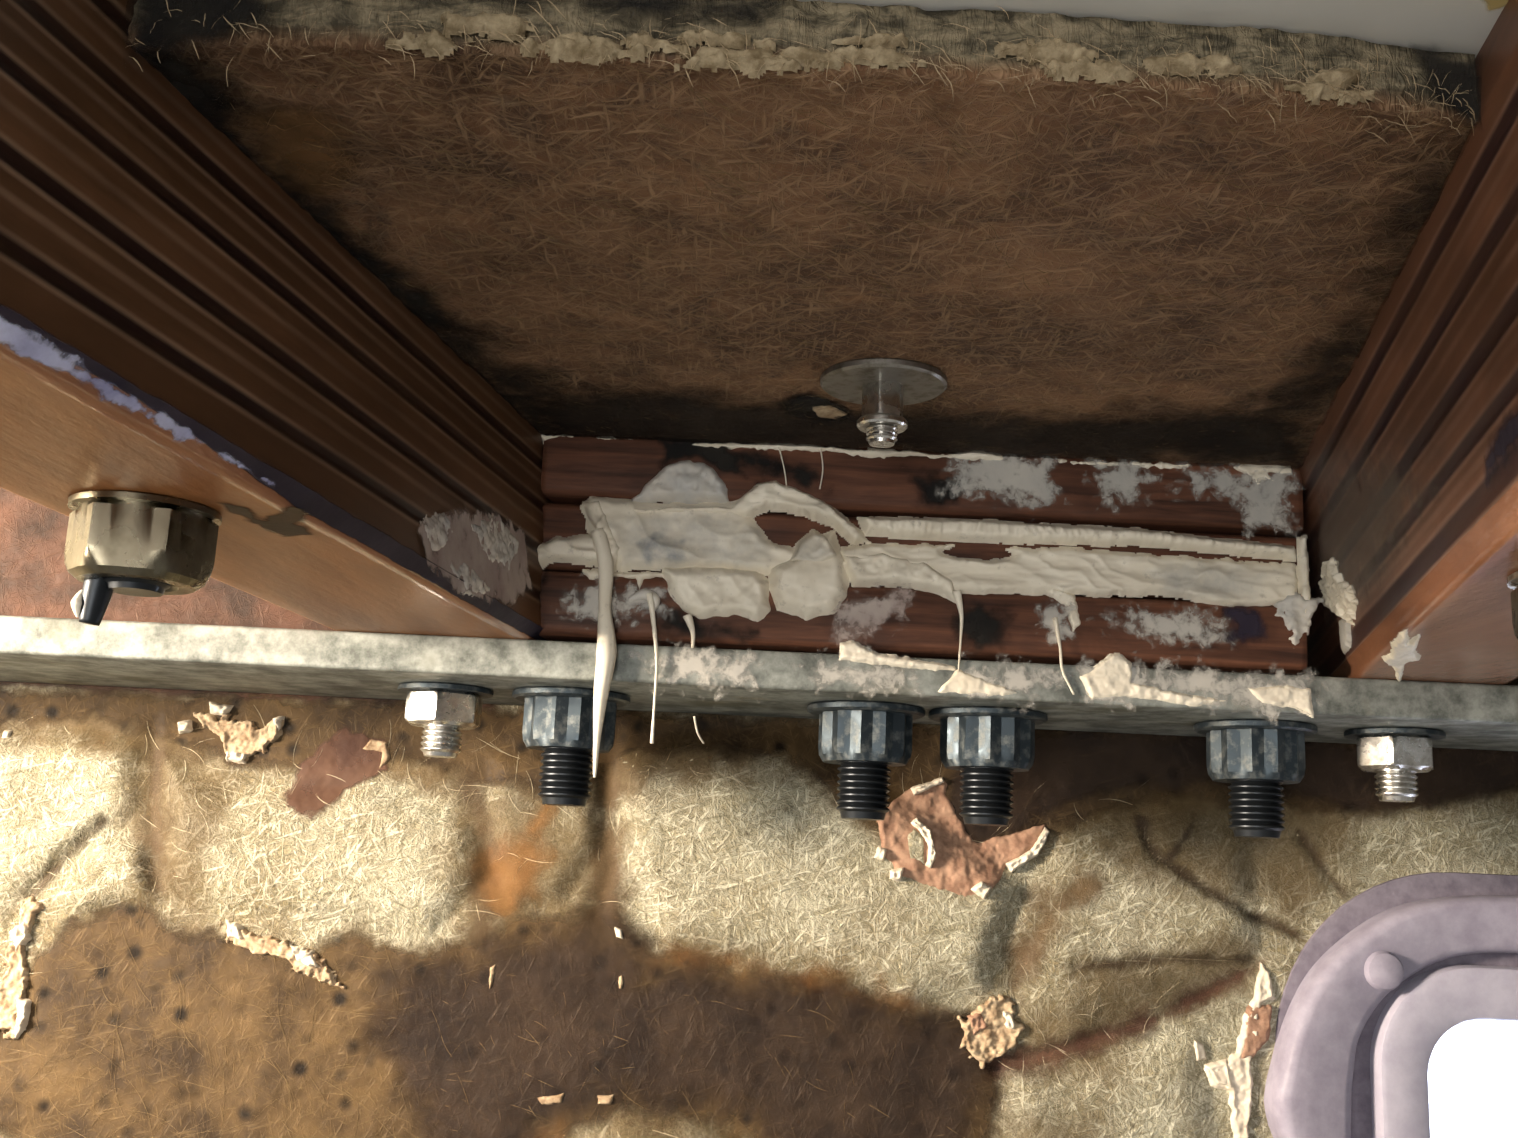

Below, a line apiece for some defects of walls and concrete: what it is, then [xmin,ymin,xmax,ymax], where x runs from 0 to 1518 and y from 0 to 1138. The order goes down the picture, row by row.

water stain [1413,47,1482,123]
water stain [131,0,870,450]
water stain [1386,179,1444,246]
water stain [894,322,1371,465]
water stain [0,487,83,619]
water stain [102,577,336,631]
spalling [874,777,1050,899]
water stain [858,723,1518,898]
water stain [0,681,998,1138]